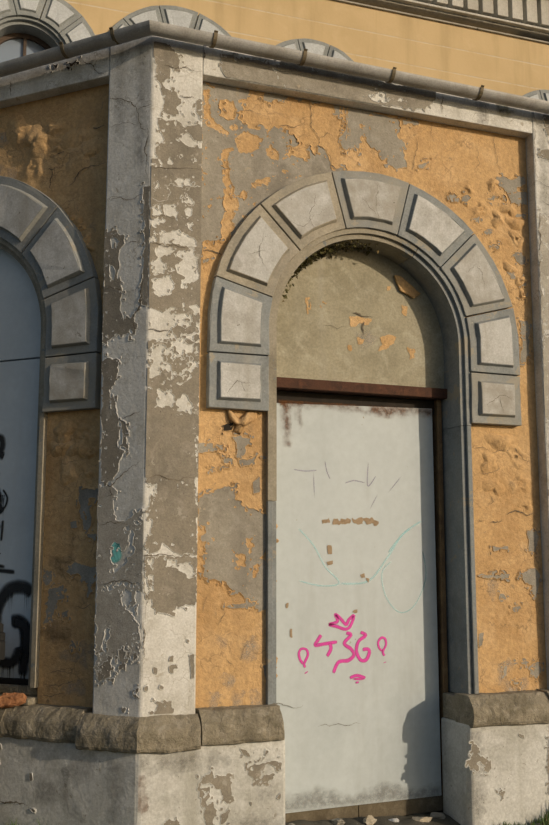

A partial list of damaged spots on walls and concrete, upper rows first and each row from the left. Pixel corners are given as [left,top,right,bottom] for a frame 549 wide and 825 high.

crack [94,98,193,200]
peeling [537,114,549,162]
peeling [445,190,472,207]
peeling [487,172,528,220]
peeling [507,208,549,424]
peeling [42,41,437,687]
peeling [132,667,175,715]
peeling [500,657,546,691]
spalling [239,748,283,787]
spalling [465,740,496,778]
spalling [195,766,235,825]
spalling [162,816,182,825]